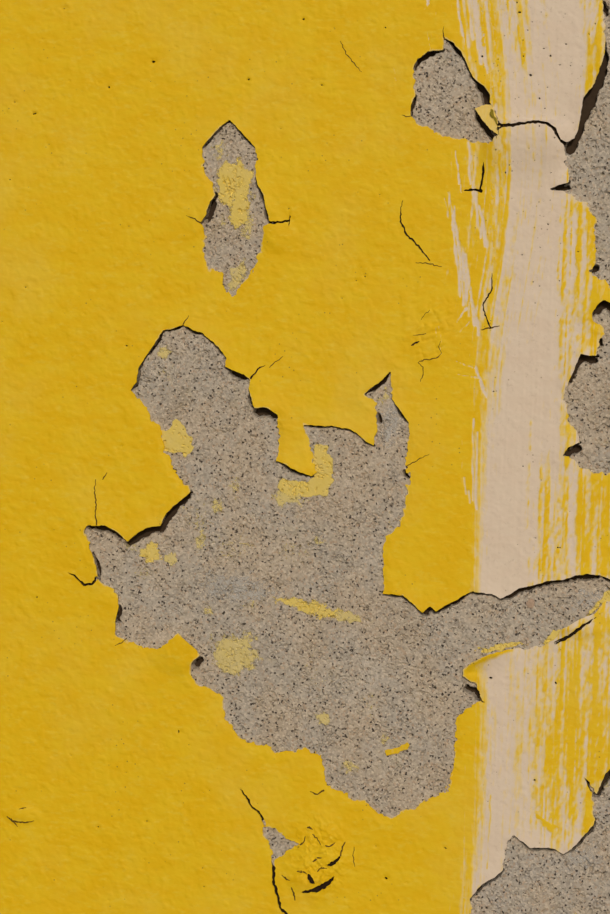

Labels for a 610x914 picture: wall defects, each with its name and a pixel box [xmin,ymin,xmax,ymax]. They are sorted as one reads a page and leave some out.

peeling [401,28,500,143]
peeling [191,110,279,297]
peeling [539,0,610,475]
peeling [77,316,610,818]
crack [242,790,264,822]
crack [272,858,288,914]
peeling [460,756,610,914]